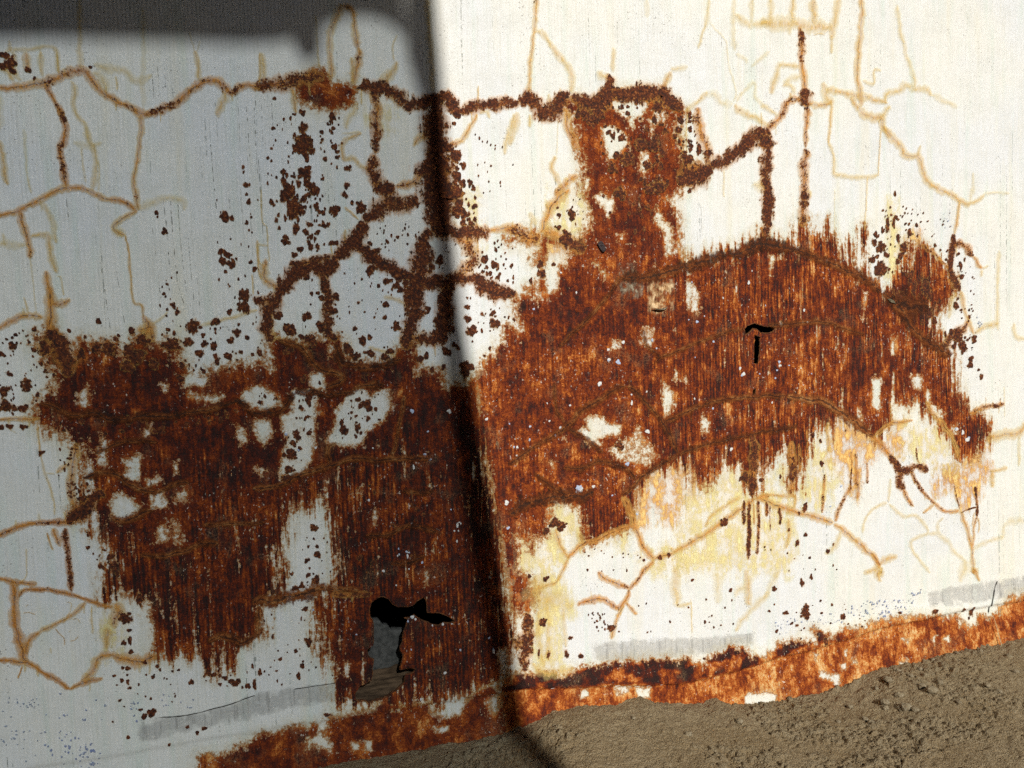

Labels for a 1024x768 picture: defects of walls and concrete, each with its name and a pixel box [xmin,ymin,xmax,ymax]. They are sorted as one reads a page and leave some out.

rust [528,0,538,90]
crack [0,0,998,454]
rust [501,227,565,274]
rust [885,202,961,345]
crack [0,444,189,689]
crack [252,396,431,493]
rust [723,501,774,574]
crack [508,383,1005,639]
rust [800,474,838,513]
rust [848,454,861,496]
crack [988,427,1024,442]
crack [207,583,372,648]